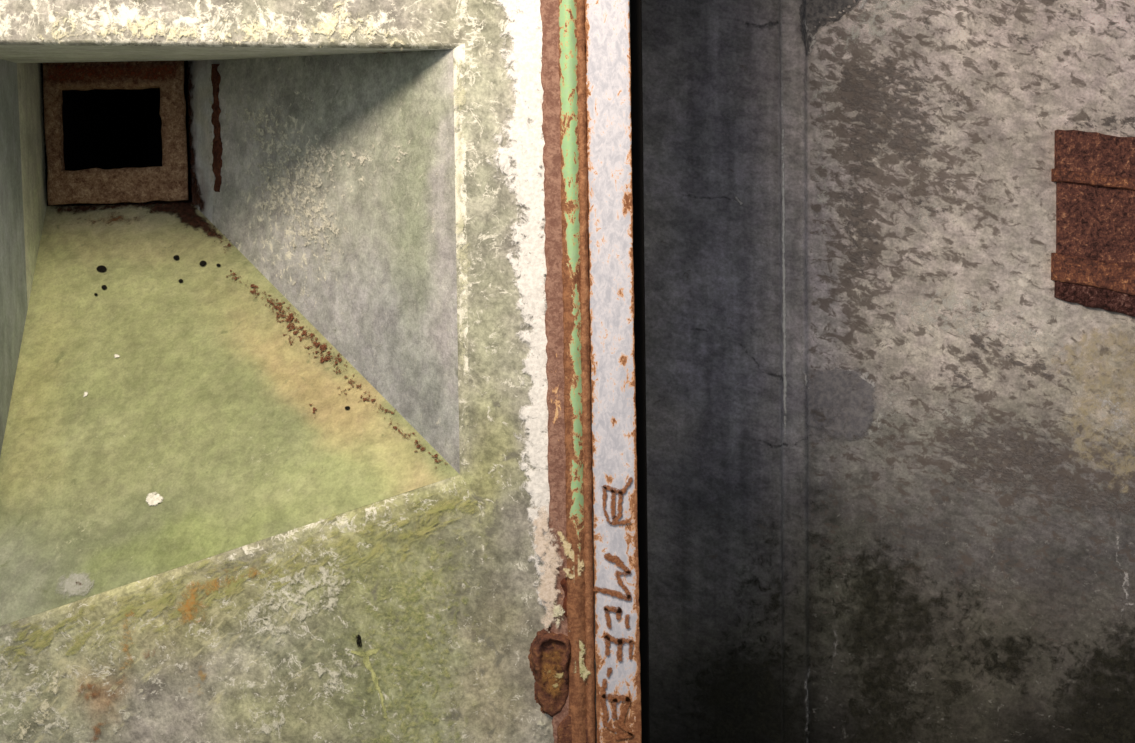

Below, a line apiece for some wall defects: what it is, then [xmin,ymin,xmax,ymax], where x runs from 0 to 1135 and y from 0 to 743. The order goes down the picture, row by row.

spalling [799,0,866,55]
corrosion [55,60,230,251]
corrosion [226,270,447,468]
corrosion [557,715,589,743]
leakage [836,541,944,743]
leakage [942,636,1048,718]
leakage [1050,627,1135,743]